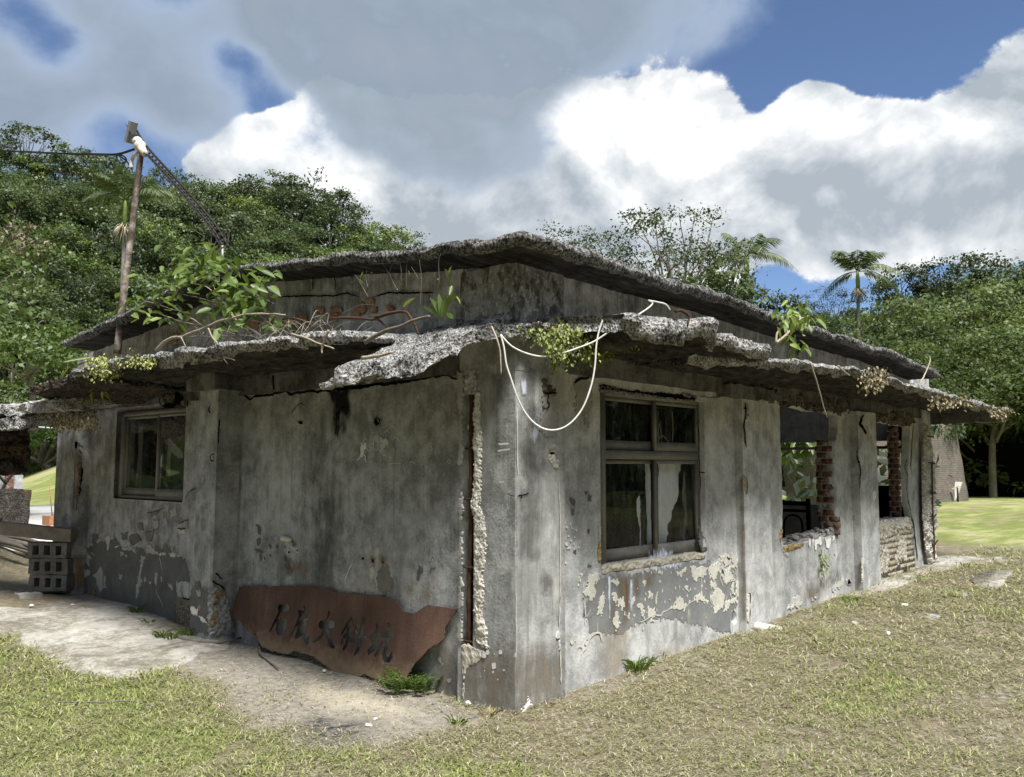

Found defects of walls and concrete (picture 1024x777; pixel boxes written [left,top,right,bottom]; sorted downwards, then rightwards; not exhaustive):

leakage [322,384,353,436]
crack [743,384,777,447]
crack [857,415,867,484]
peeling [84,503,235,638]
spalling [447,369,489,699]
peeling [570,524,751,659]
flaking render [779,529,804,557]